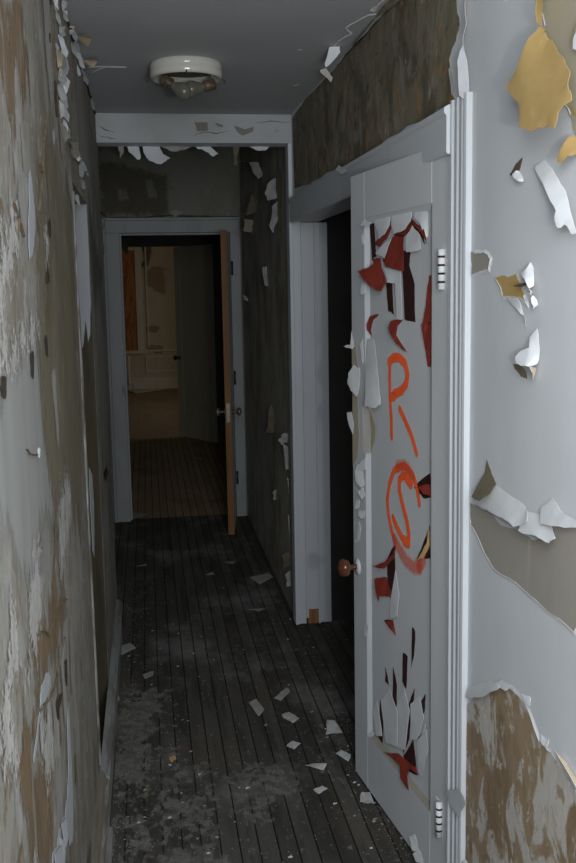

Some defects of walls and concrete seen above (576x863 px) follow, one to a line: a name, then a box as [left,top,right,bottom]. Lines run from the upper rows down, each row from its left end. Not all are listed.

peeling [49,0,98,205]
peeling [118,146,218,164]
peeling [233,147,278,233]
peeling [292,0,469,189]
peeling [506,0,576,234]
peeling [515,329,540,380]
peeling [521,262,538,311]
peeling [470,461,576,636]
peeling [54,818,68,863]
peeling [446,679,576,863]